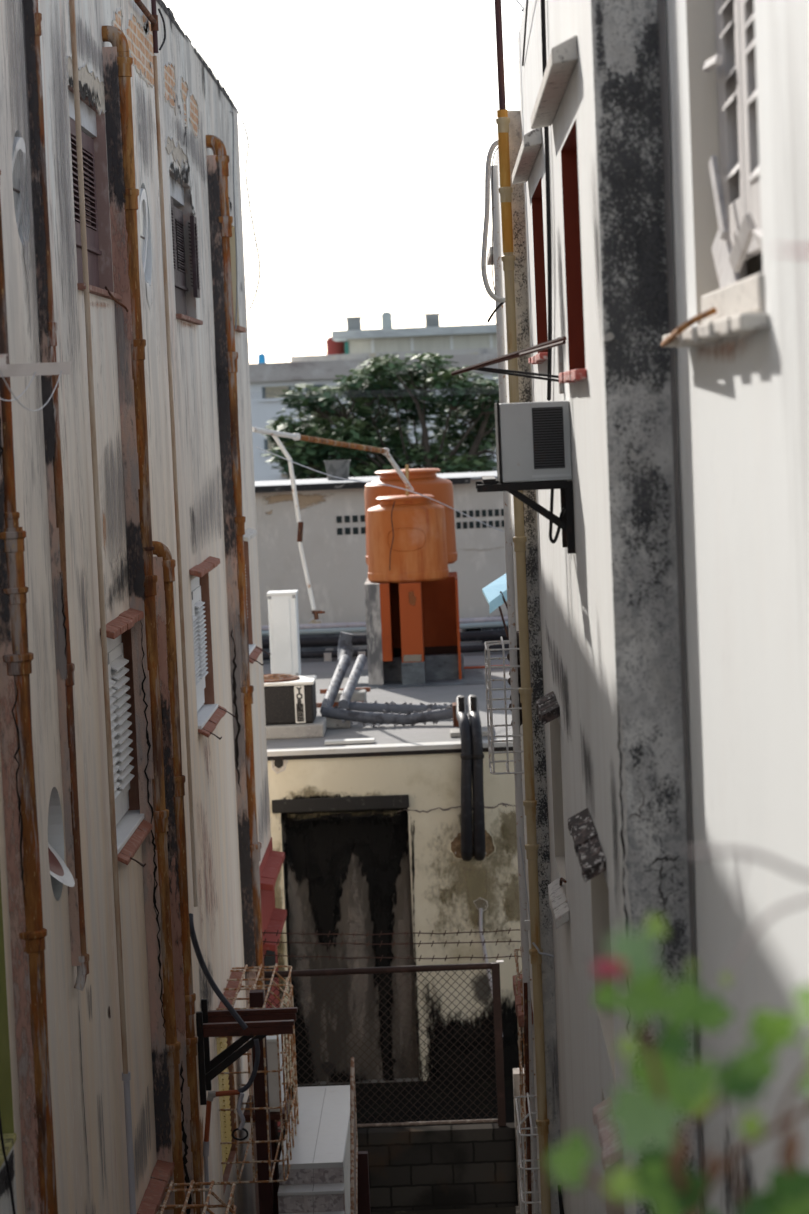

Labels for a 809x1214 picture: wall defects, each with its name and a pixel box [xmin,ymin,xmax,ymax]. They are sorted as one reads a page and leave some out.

flaking render [111,7,199,139]
damp [6,0,51,360]
damp [55,11,133,396]
damp [38,375,56,465]
damp [177,120,237,557]
damp [0,478,11,642]
damp [44,575,67,680]
damp [104,435,145,608]
damp [228,614,246,771]
damp [0,681,42,1212]
damp [237,786,525,1084]
damp [134,1049,171,1185]